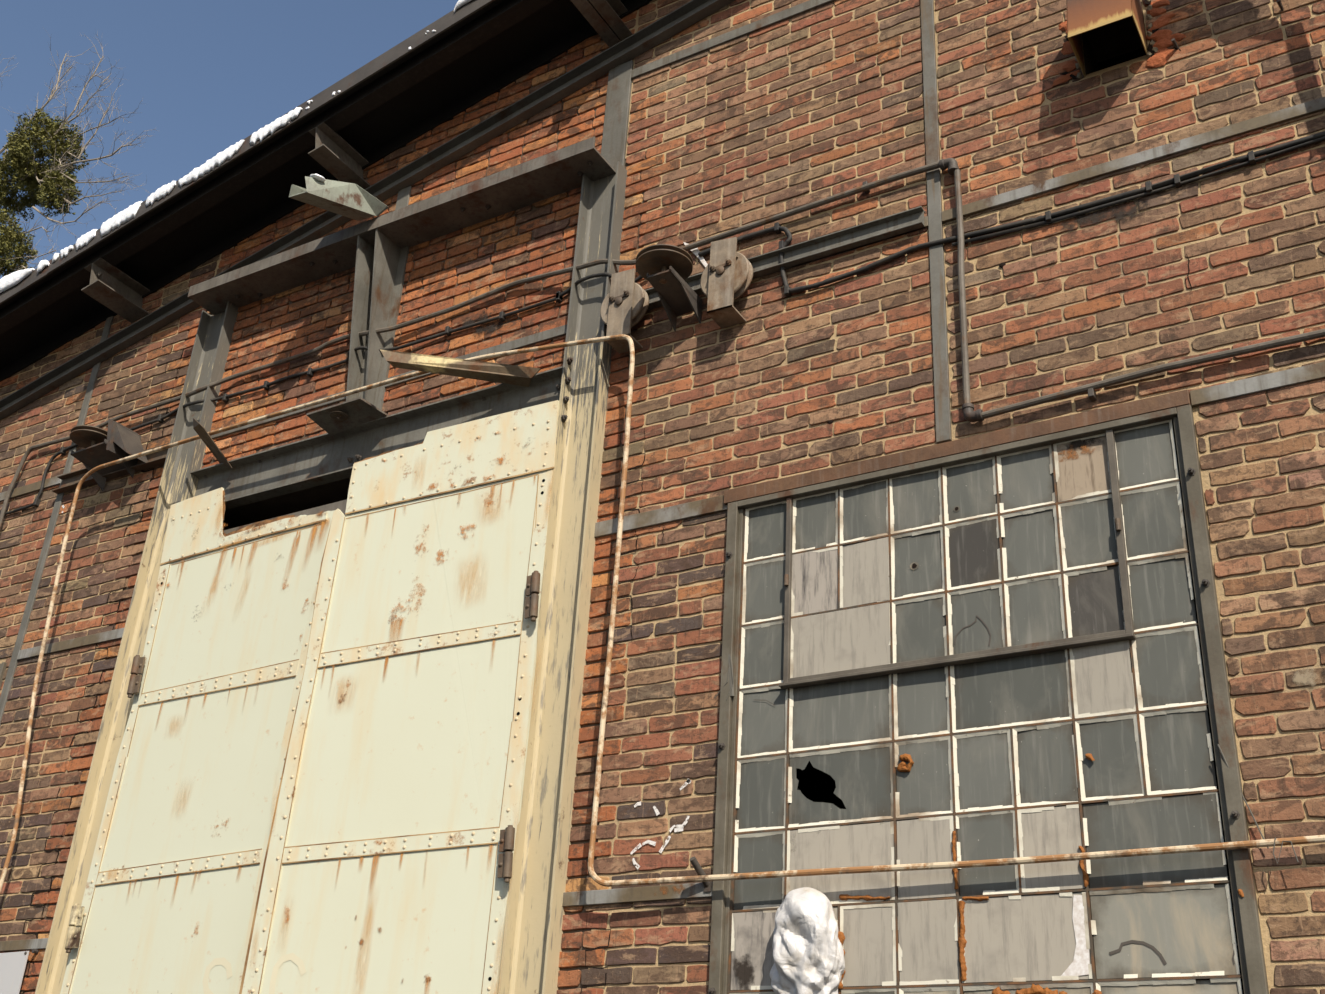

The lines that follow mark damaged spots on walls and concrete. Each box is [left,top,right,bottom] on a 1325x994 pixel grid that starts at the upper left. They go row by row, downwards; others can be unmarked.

peeling [1144,0,1187,68]
corrosion [289,511,328,557]